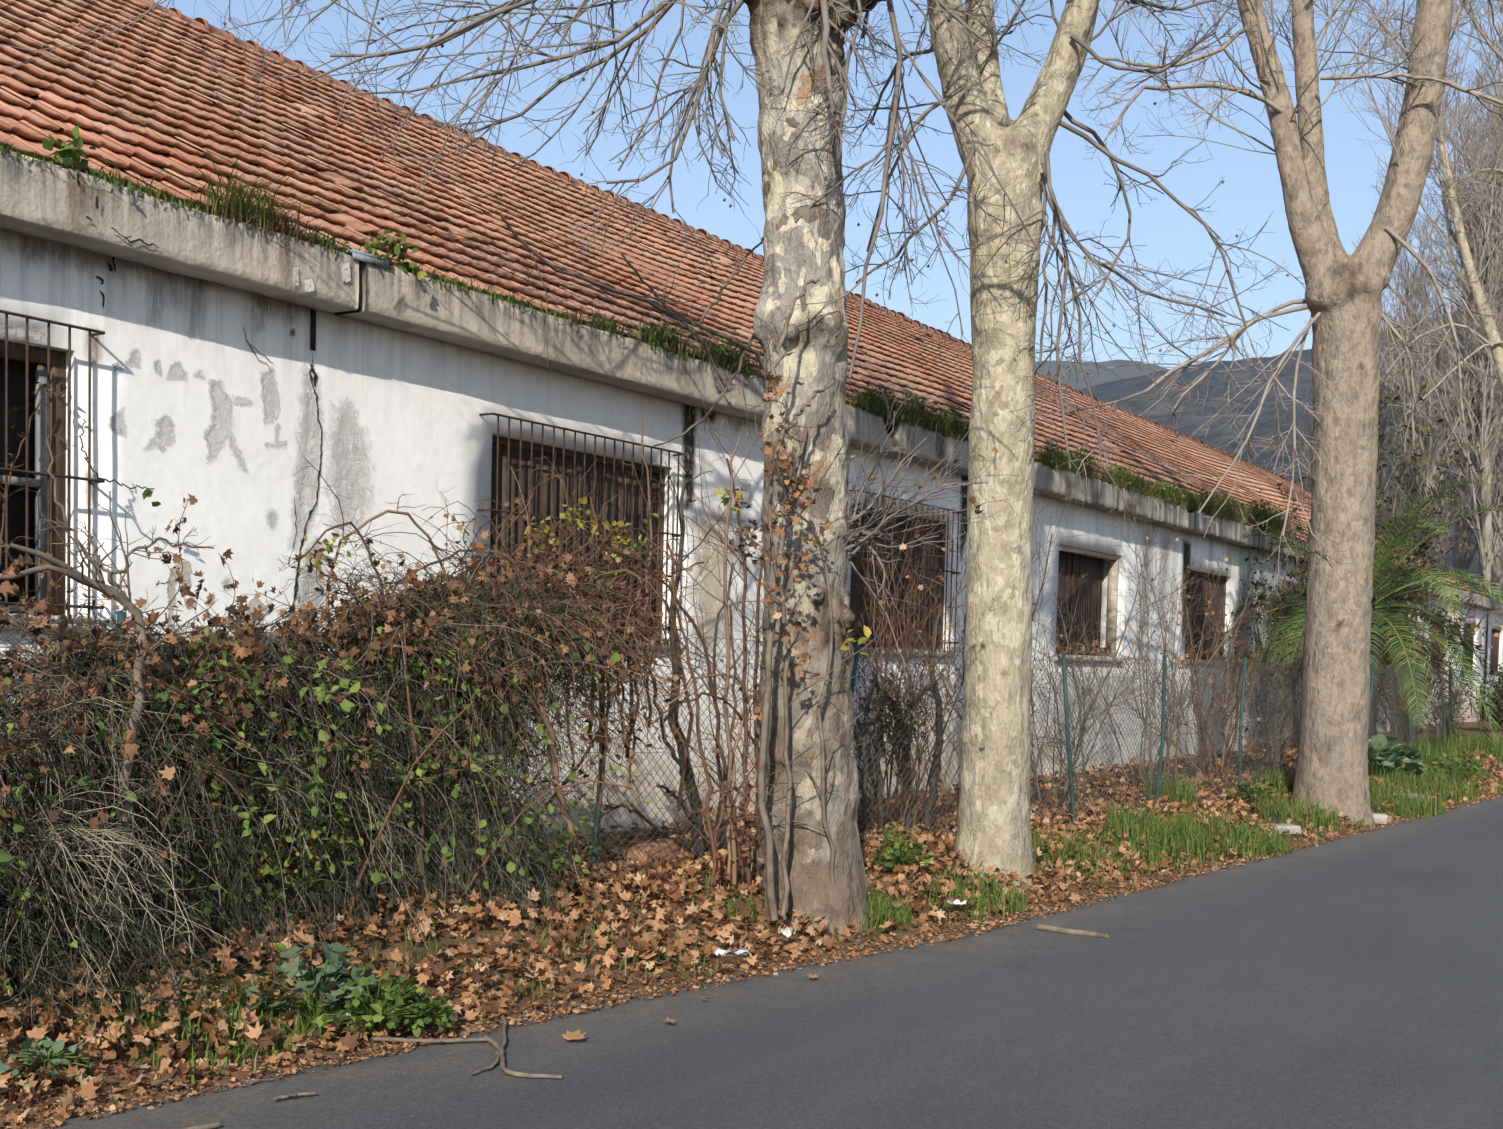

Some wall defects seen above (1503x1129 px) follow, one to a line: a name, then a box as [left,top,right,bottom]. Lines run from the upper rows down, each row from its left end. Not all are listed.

peeling [109,406,126,436]
peeling [113,325,322,610]
crack [291,354,323,605]
leakage [331,404,369,525]